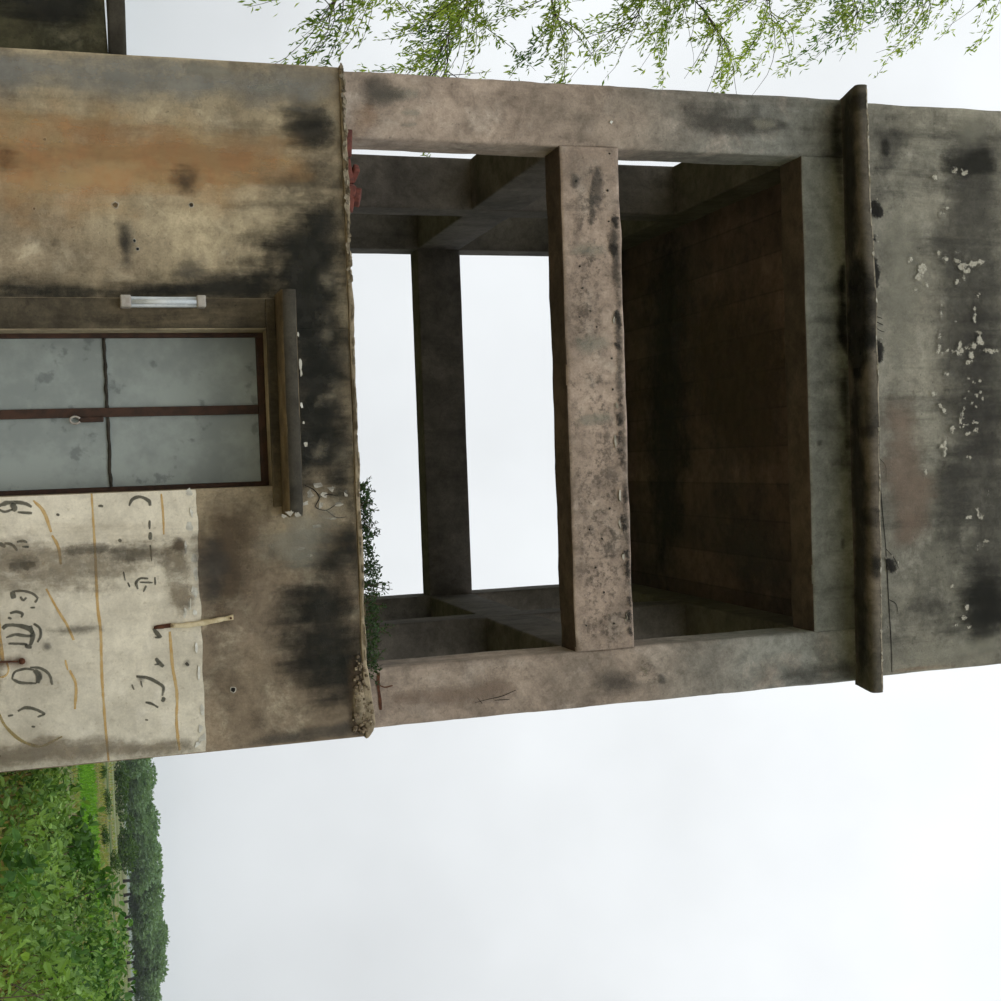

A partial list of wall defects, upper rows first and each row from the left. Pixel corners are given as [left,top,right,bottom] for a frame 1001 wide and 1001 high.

leakage [0,57,333,145]
leakage [0,279,117,297]
leakage [130,198,353,509]
flaking render [908,256,929,291]
flaking render [937,250,985,285]
flaking render [937,293,999,365]
leakage [943,148,1001,526]
flaking render [940,377,984,457]
leakage [201,516,249,599]
leakage [284,532,361,698]
spalling [351,511,374,734]
leakage [964,554,1001,637]